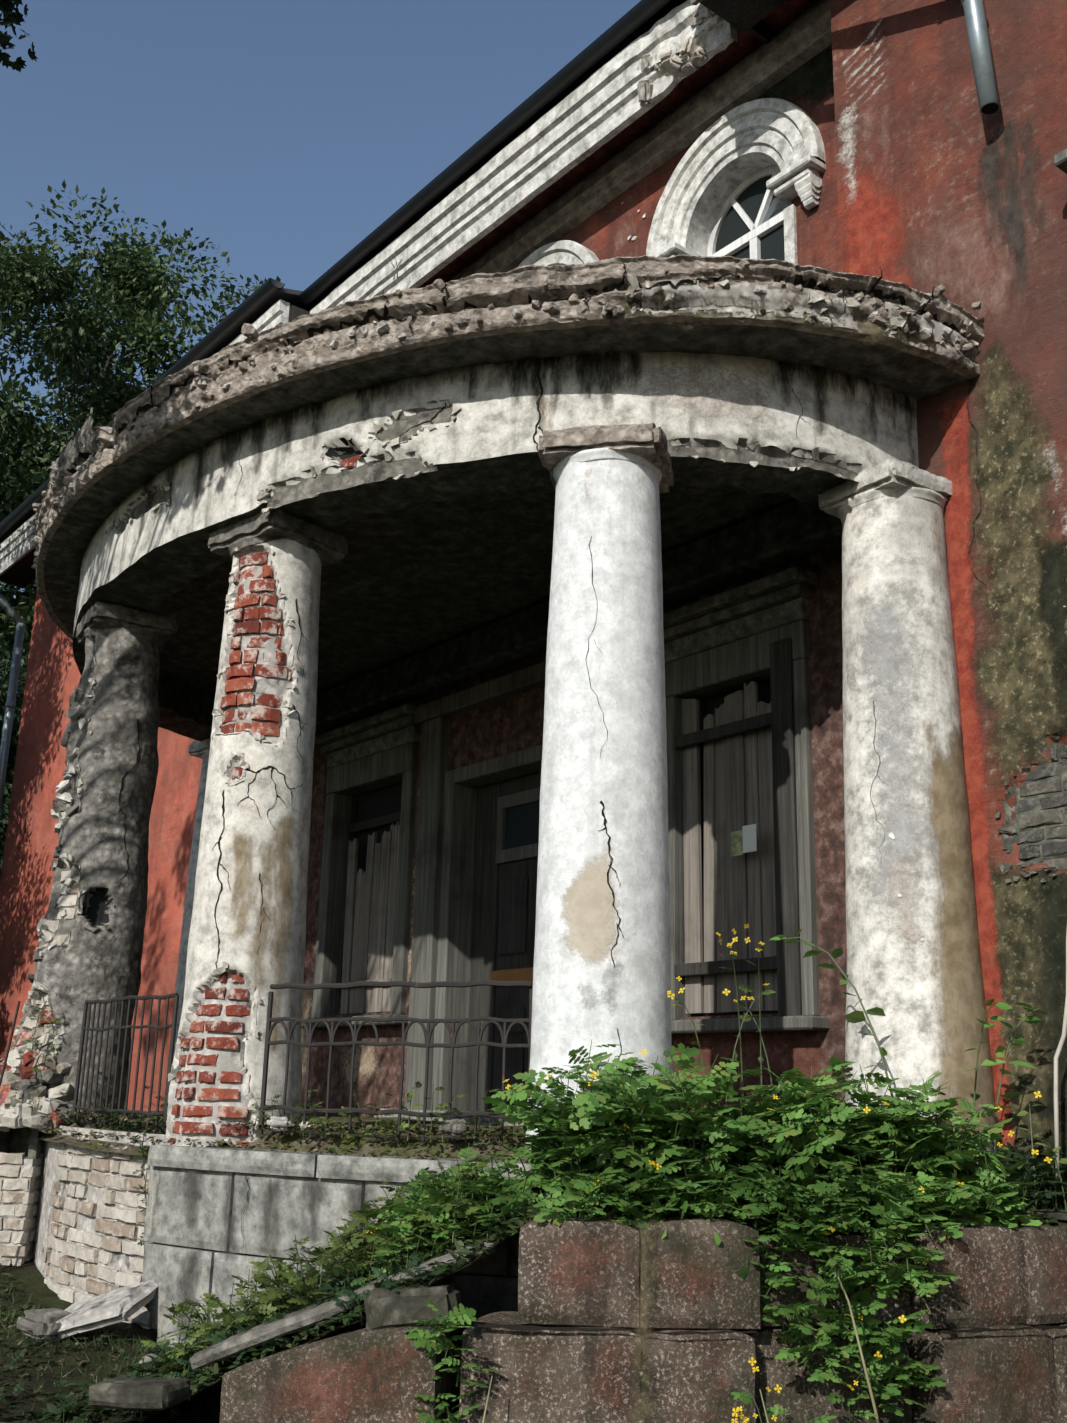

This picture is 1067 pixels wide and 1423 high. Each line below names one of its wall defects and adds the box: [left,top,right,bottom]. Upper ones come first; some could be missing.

efflorescence [838,107,871,197]
spalling [255,398,461,514]
water stain [577,352,767,421]
spalling [628,274,860,330]
spalling [211,545,300,746]
crack [585,536,608,755]
water stain [1039,541,1067,734]
crack [214,599,308,969]
spalling [0,636,115,1134]
spalling [163,962,262,1148]
crack [598,801,624,967]
water stain [927,728,1067,1206]